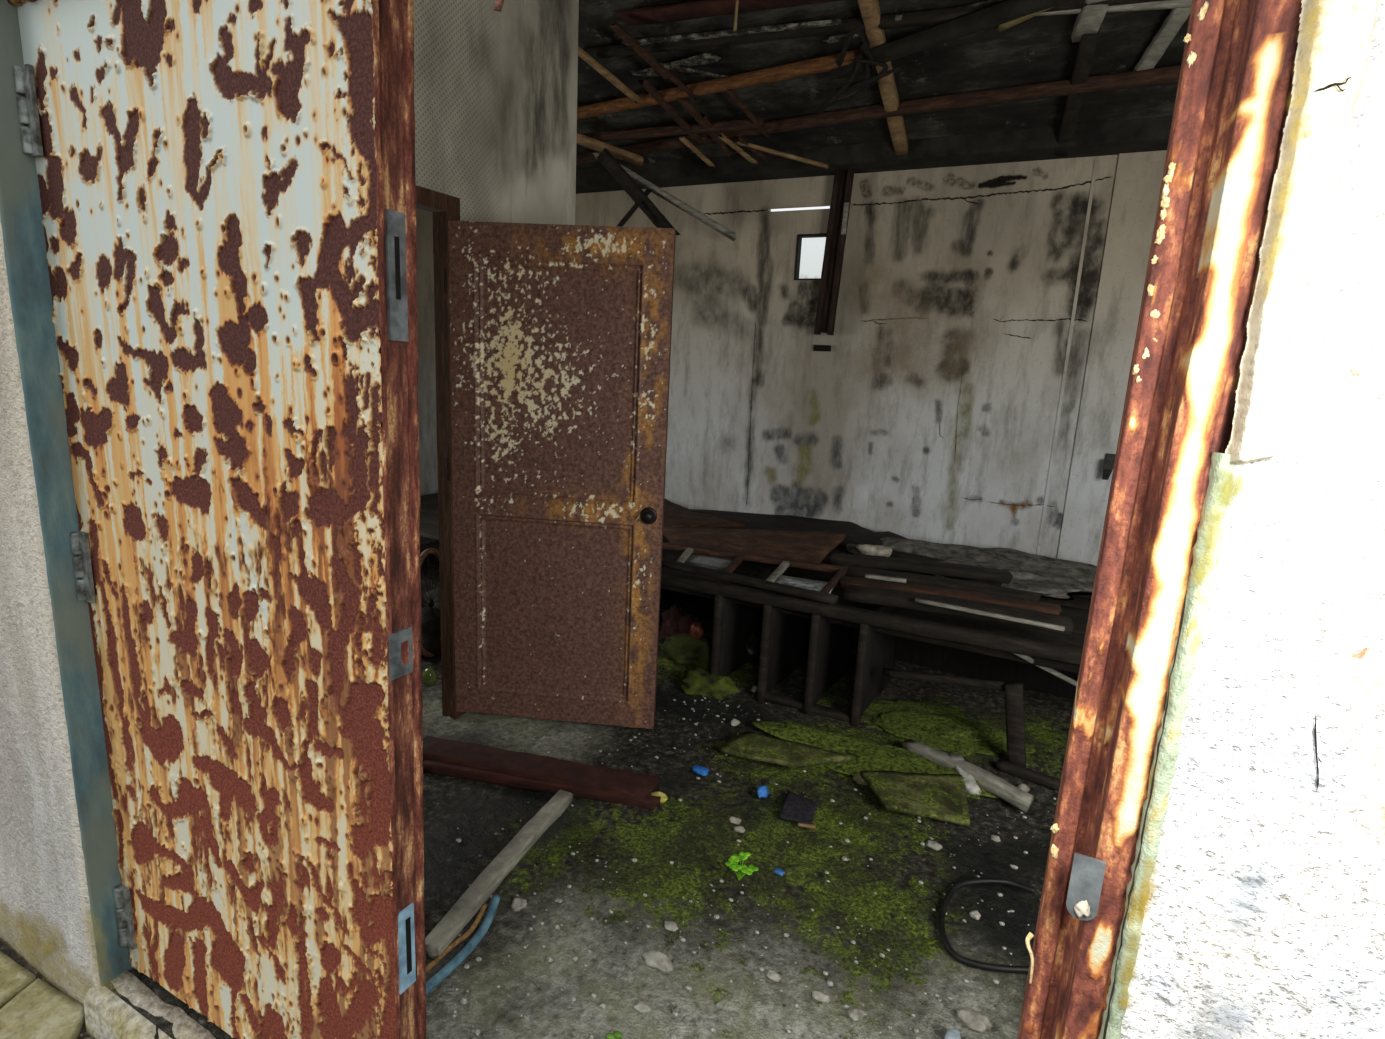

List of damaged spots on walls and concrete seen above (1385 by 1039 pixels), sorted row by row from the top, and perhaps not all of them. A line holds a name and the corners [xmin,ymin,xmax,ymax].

leakage [744,216,820,325]
leakage [894,252,992,315]
leakage [1050,194,1103,375]
leakage [746,429,816,486]
crack [154,1022,163,1039]